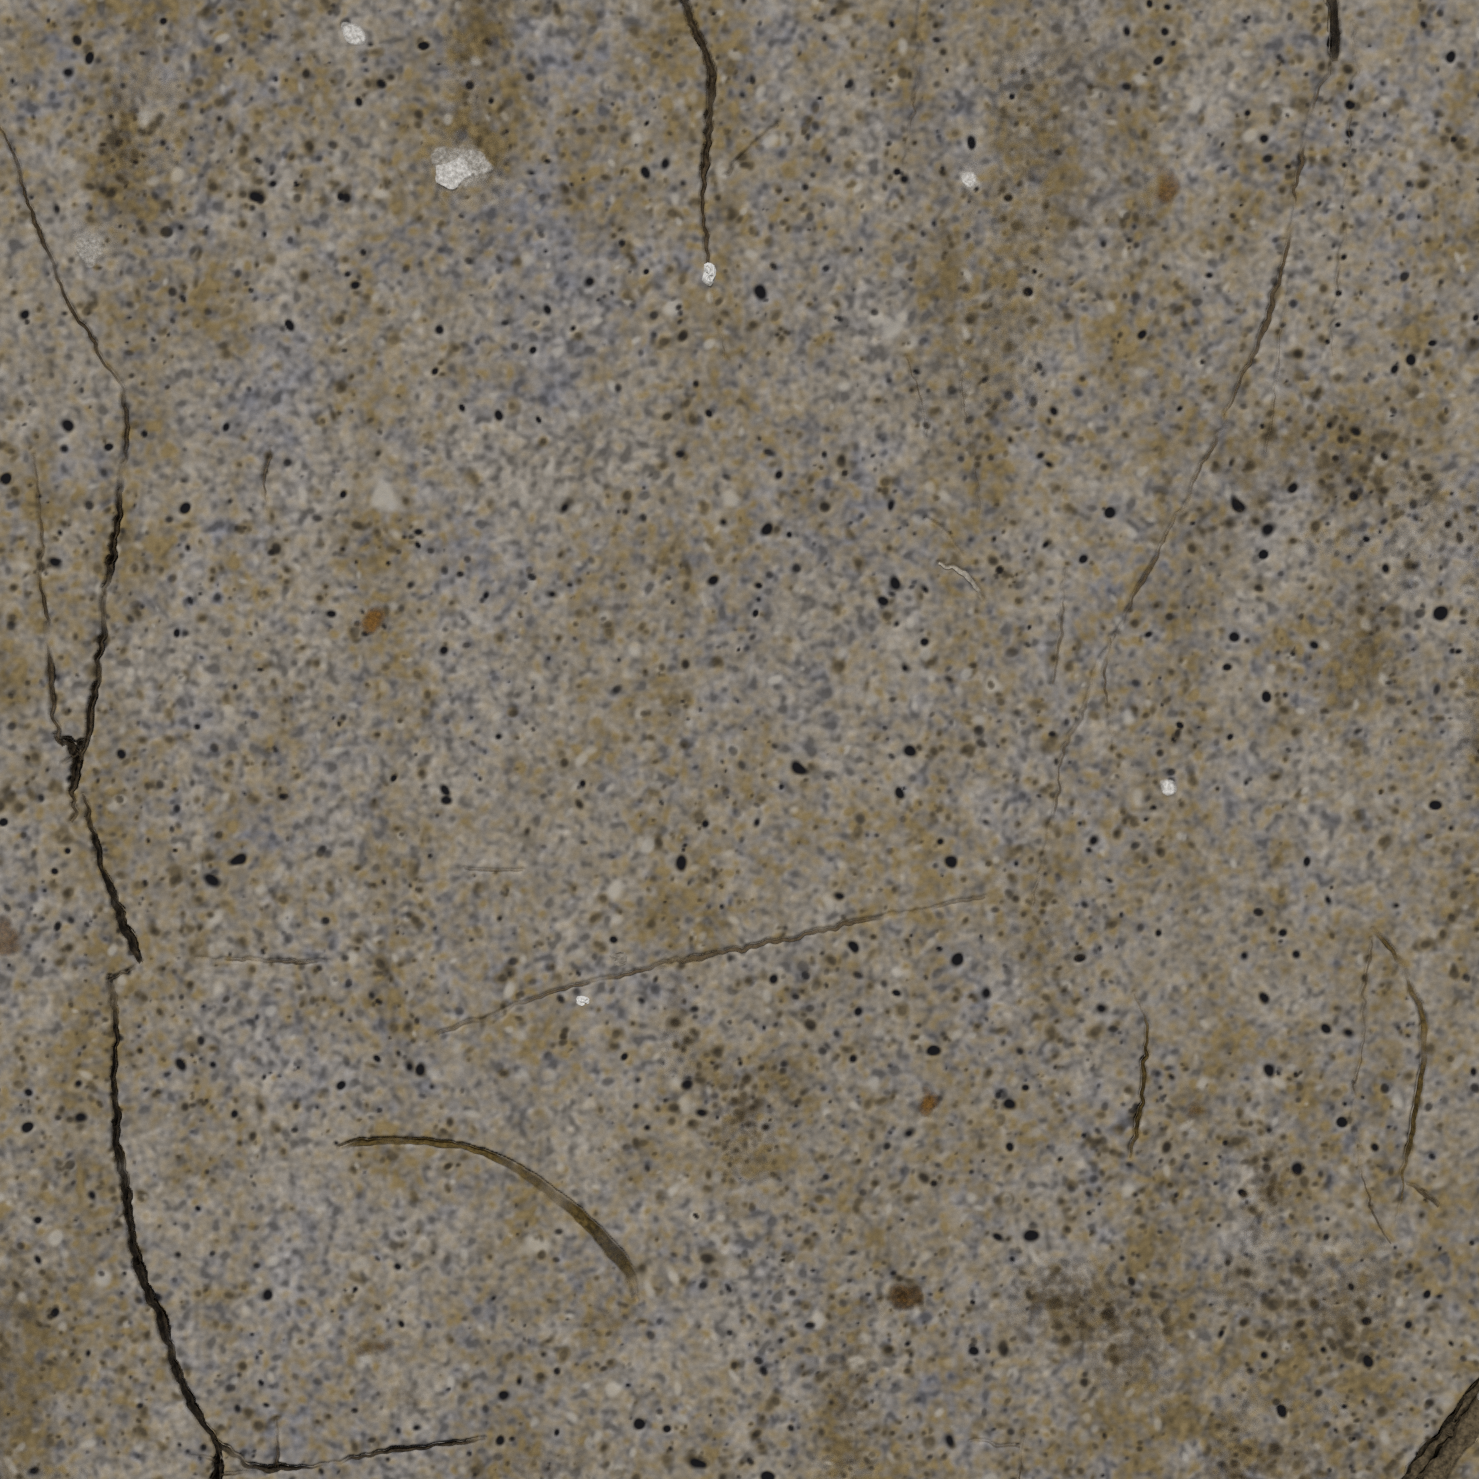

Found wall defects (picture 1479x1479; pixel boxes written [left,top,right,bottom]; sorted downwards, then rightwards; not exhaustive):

crack [1313,0,1340,103]
crack [681,0,716,287]
crack [1292,149,1304,198]
crack [1227,240,1290,408]
crack [1193,441,1217,482]
crack [1130,525,1172,606]
crack [1101,666,1109,696]
crack [0,128,476,1479]
crack [1054,762,1062,807]
crack [524,918,873,1006]
crack [1402,1378,1479,1479]